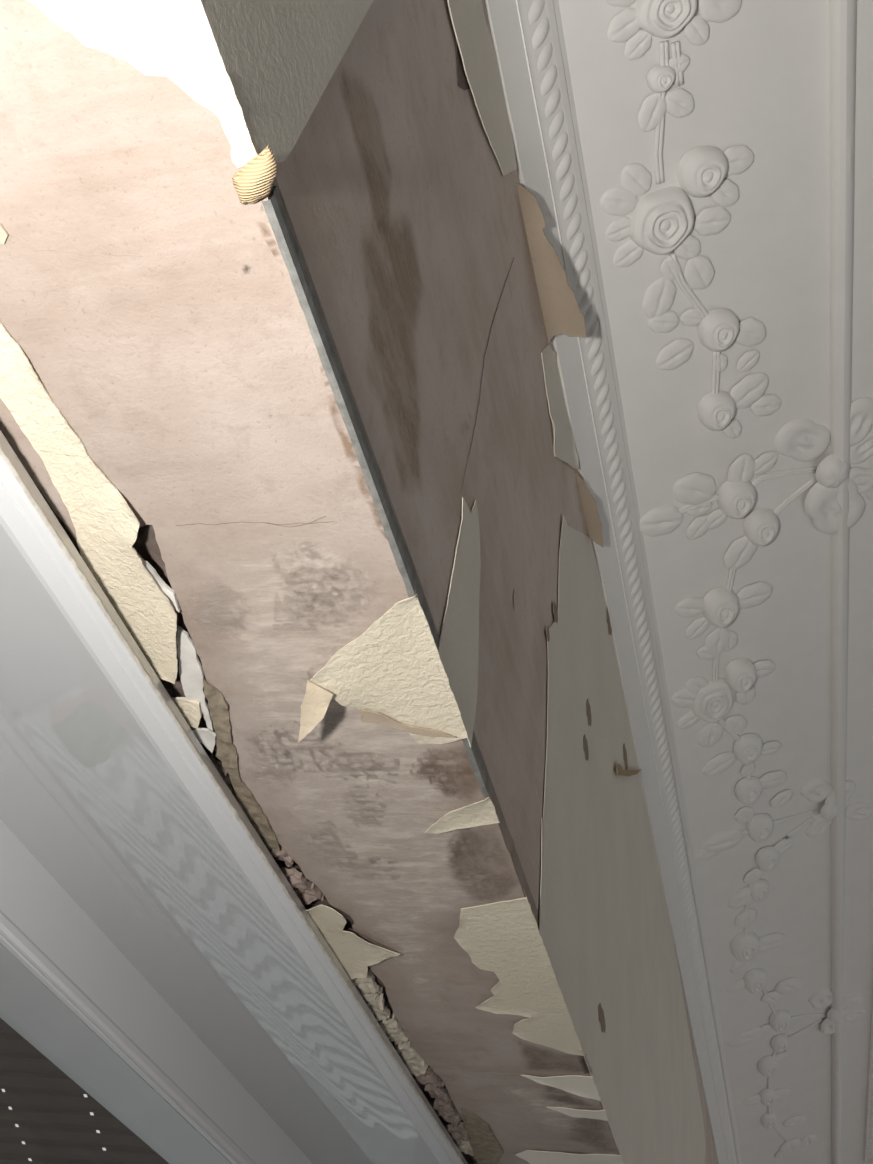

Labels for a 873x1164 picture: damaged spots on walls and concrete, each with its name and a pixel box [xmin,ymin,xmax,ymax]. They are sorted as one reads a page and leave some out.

water stain [359,142,419,481]
crack [176,516,334,527]
spalling [351,969,503,1164]